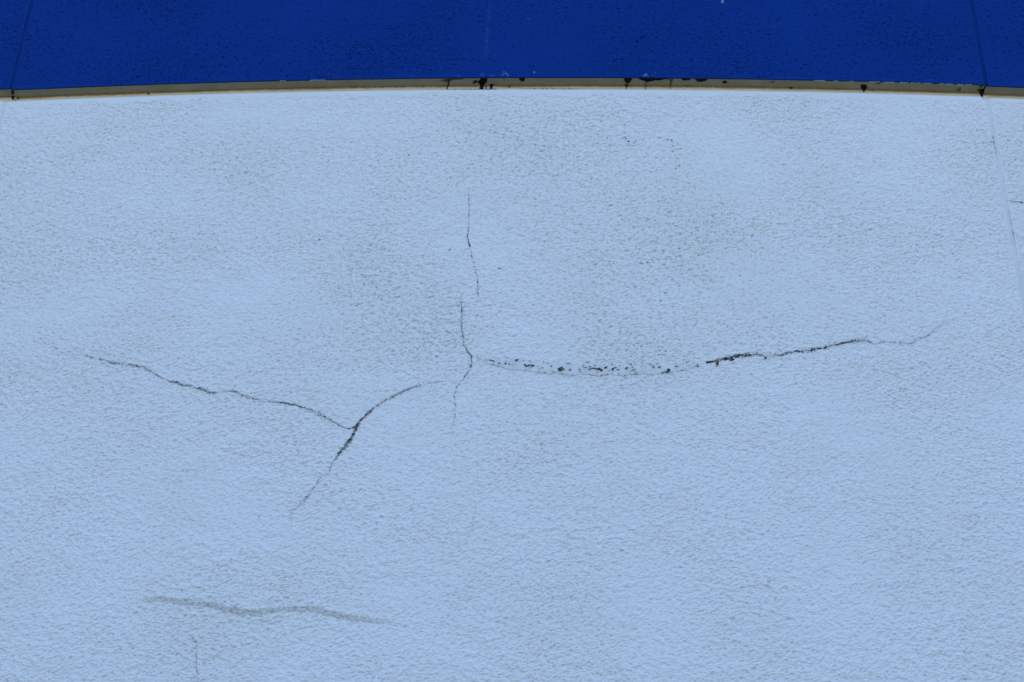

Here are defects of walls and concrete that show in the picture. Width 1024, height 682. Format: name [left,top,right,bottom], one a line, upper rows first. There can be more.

crack [706,340,870,364]
crack [107,360,421,503]